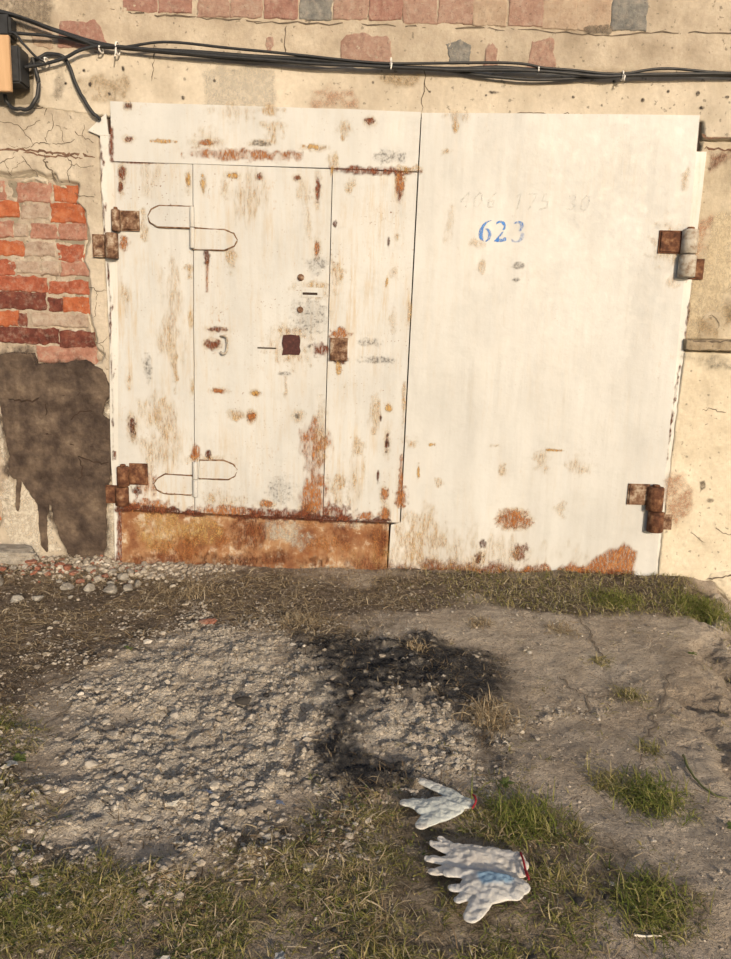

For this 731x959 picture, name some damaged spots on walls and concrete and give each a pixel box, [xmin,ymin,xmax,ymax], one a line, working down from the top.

crack [0,106,95,197]
rust [200,106,318,161]
rust [331,157,423,199]
spalling [0,175,112,372]
crack [693,315,731,343]
peeling [0,407,61,553]
damp [0,348,112,557]
rust [115,418,636,575]